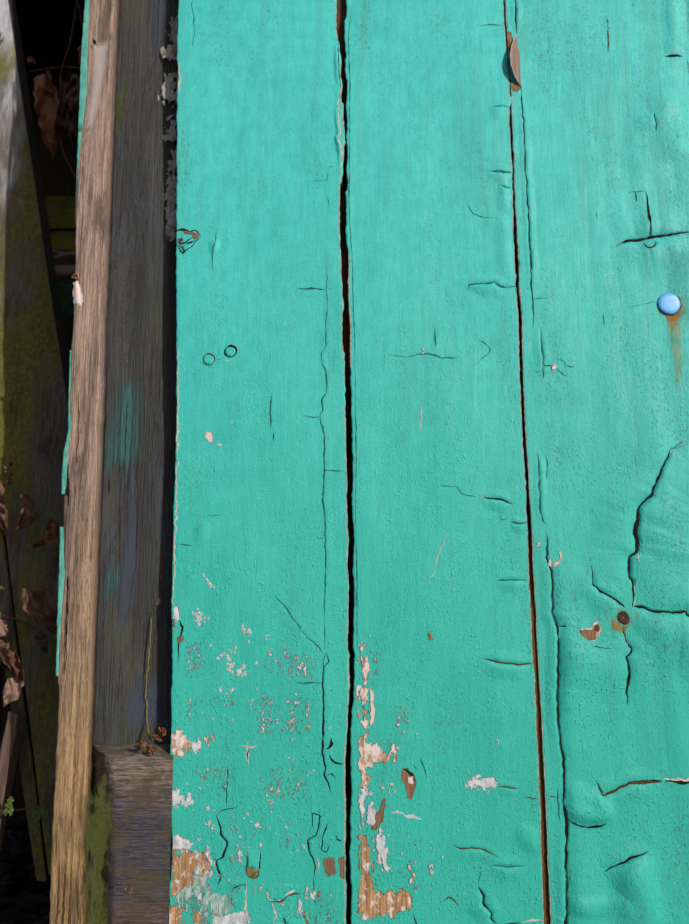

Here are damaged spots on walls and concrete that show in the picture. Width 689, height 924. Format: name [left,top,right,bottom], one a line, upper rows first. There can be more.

peeling [161,15,178,61]
peeling [157,71,186,248]
crack [596,191,689,307]
rust [657,295,681,331]
peeling [173,604,212,678]
peeling [216,635,318,743]
crack [442,418,689,924]
peeling [171,729,215,758]
peeling [356,636,443,920]
peeling [169,756,314,924]
peeling [272,885,338,924]
peeling [323,857,345,879]